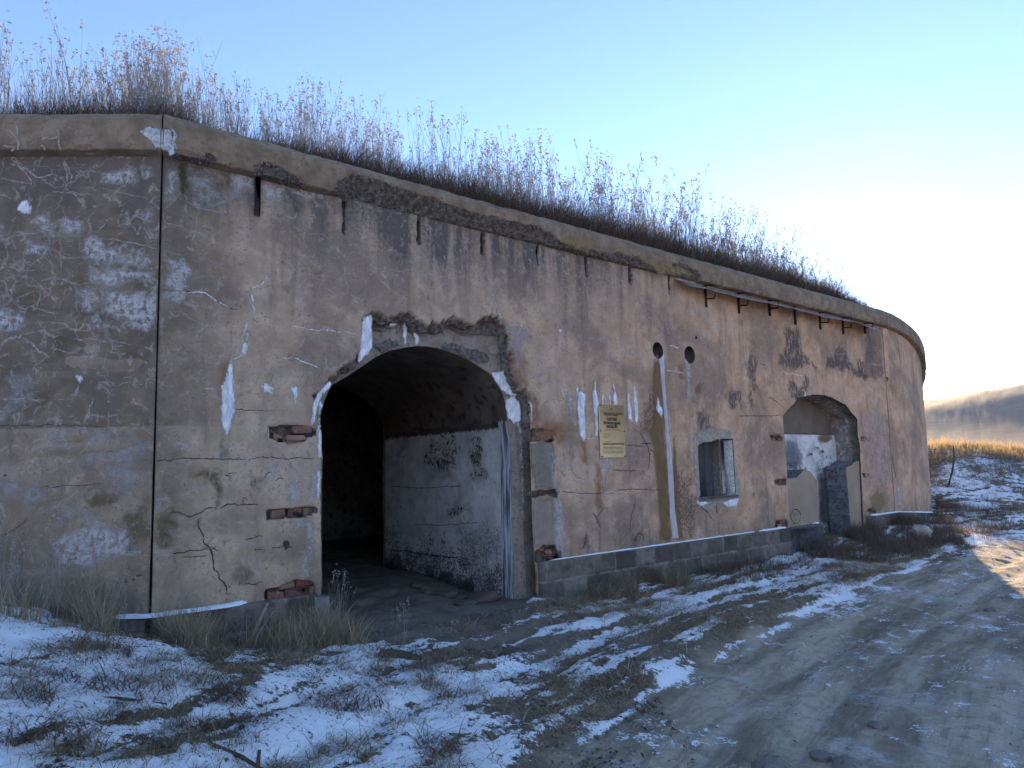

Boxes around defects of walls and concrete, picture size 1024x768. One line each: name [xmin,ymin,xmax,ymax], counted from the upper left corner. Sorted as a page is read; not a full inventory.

crack [1,125,153,427]
spalling [328,174,702,282]
spalling [269,425,317,444]
spalling [312,312,562,563]
spalling [774,434,832,486]
crack [173,497,292,594]
spalling [264,579,318,600]
spalling [266,506,318,520]